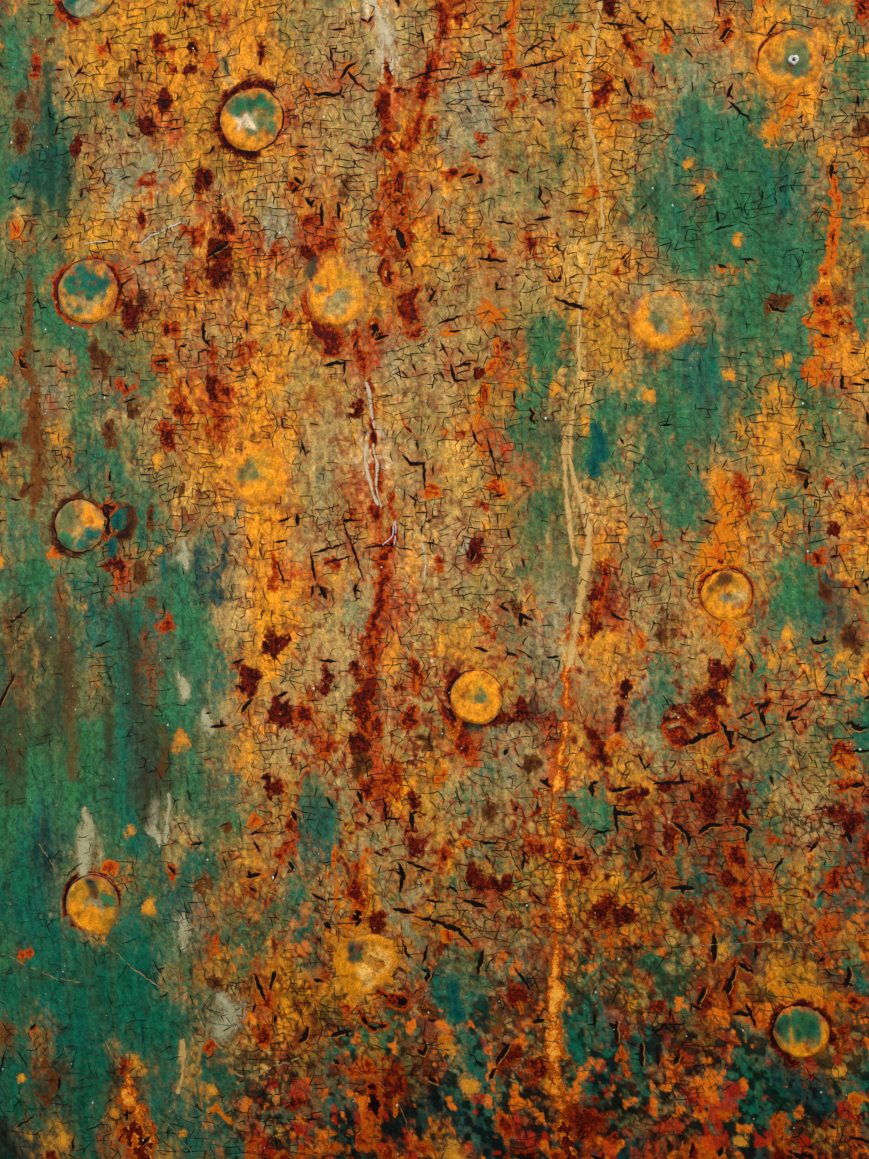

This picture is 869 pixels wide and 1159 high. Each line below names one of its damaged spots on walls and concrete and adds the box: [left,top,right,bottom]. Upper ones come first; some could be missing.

corrosion [364,0,465,287]
crack [460,173,483,184]
crack [37,425,87,470]
corrosion [657,137,853,738]
corrosion [261,327,514,898]
corrosion [442,661,531,772]
crack [52,664,219,916]
corrosion [494,663,654,1159]
crack [468,1043,516,1081]
crack [529,1004,561,1043]
corrosion [765,983,865,1079]
crack [732,1093,869,1159]